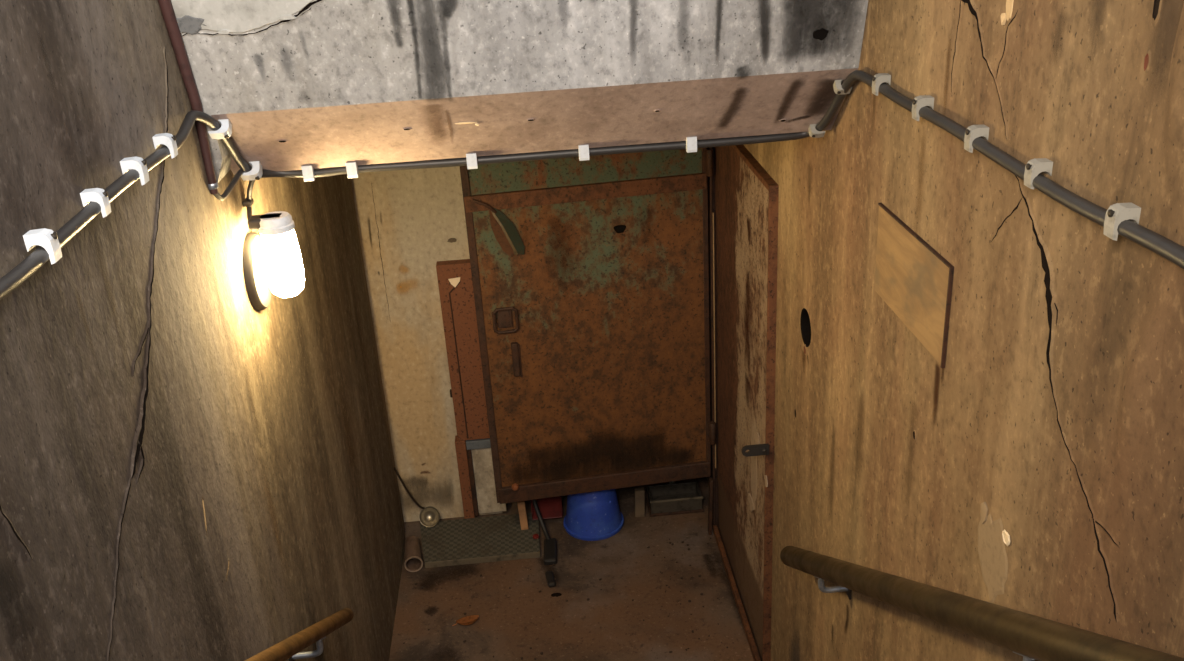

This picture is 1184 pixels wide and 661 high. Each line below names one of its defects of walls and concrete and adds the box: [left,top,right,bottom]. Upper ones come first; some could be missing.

peeling [171,0,314,35]
damp [389,0,456,100]
damp [760,0,769,58]
damp [786,0,855,58]
crack [951,0,1019,141]
crack [370,181,391,323]
crack [107,0,326,661]
crack [991,175,1120,623]